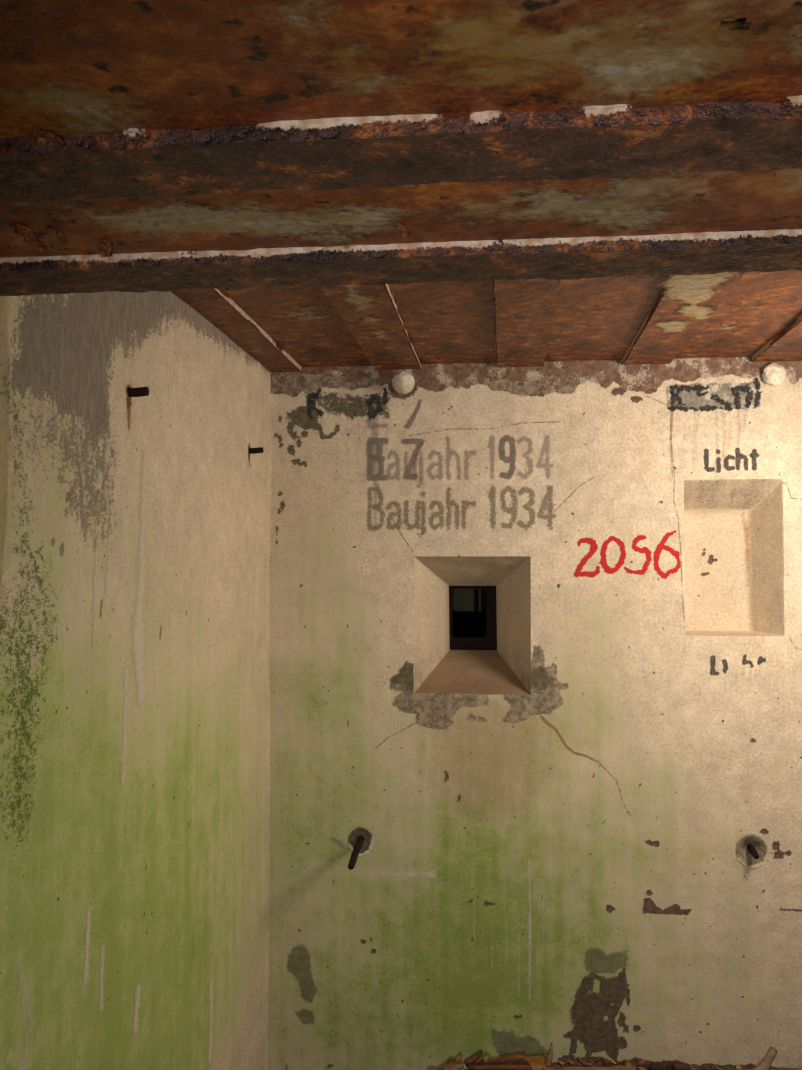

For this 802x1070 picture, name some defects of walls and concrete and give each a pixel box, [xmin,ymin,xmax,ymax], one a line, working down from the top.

peeling [270,357,802,403]
spalling [390,661,489,730]
spalling [503,645,569,723]
crack [540,715,632,816]
water stain [83,905,105,1011]
water stain [287,946,316,1024]
spalling [492,948,630,1062]